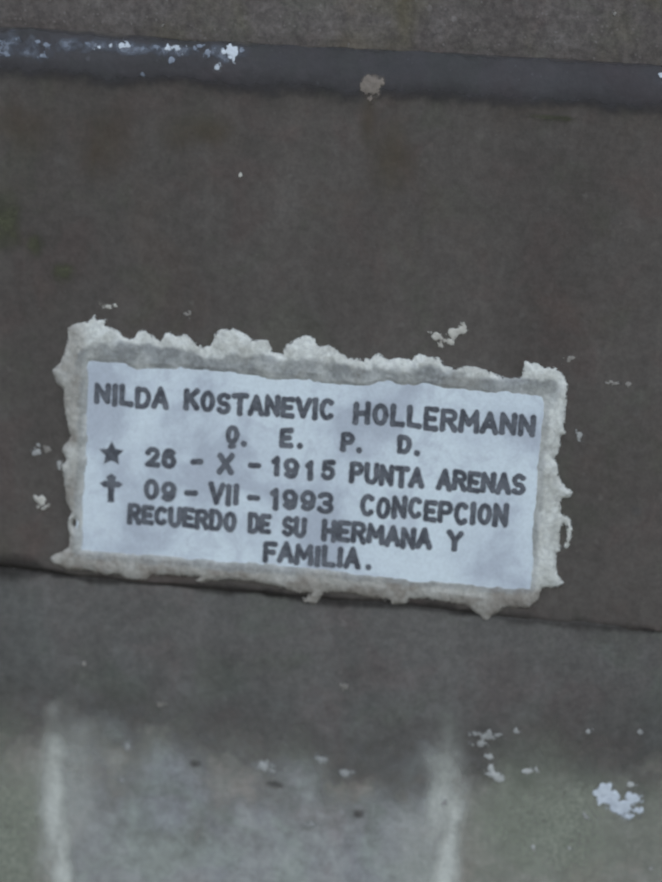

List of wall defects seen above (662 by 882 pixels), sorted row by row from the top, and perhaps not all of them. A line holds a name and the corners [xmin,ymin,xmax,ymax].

leakage [42,736,73,882]
leakage [428,758,463,882]